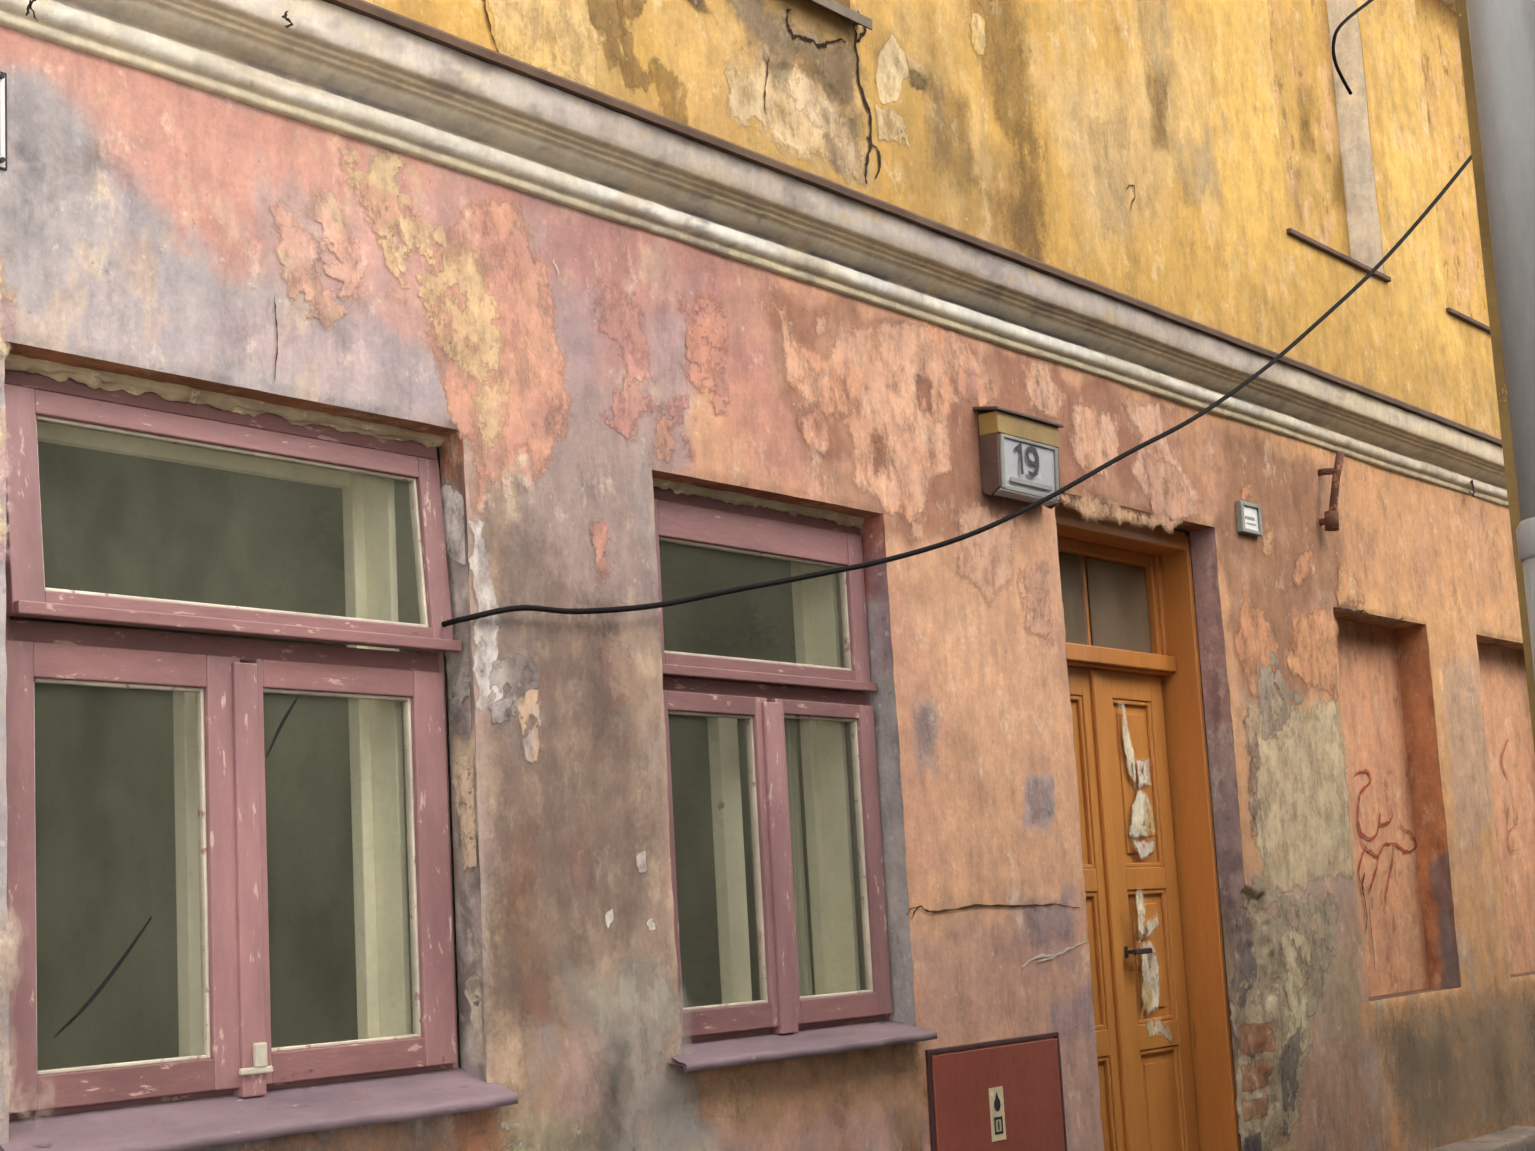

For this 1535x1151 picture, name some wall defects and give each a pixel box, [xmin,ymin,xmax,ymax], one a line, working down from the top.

crack [25,0,38,22]
crack [484,0,499,52]
crack [764,8,881,184]
spalling [725,0,927,183]
peeling [971,13,985,55]
water stain [970,0,1044,261]
peeling [0,410,12,561]
peeling [270,147,570,870]
peeling [779,310,998,542]
peeling [957,502,1054,641]
crack [906,903,1079,919]
flaking render [1230,568,1365,1151]